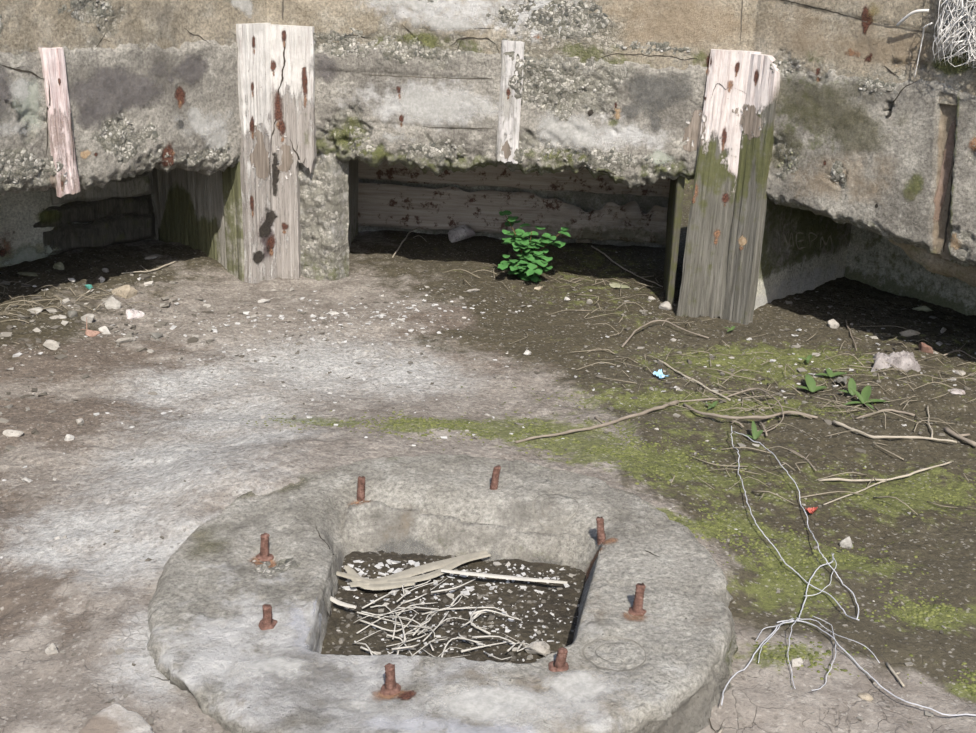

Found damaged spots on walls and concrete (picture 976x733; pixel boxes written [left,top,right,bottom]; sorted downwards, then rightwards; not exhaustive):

leakage [0,71,38,133]
spalling [91,116,158,164]
spalling [184,142,231,168]
spalling [325,123,377,161]
spalling [394,139,470,164]
spalling [495,134,678,177]
leakage [773,133,802,166]
leakage [837,113,879,150]
rust [585,538,616,582]
rust [375,691,416,700]